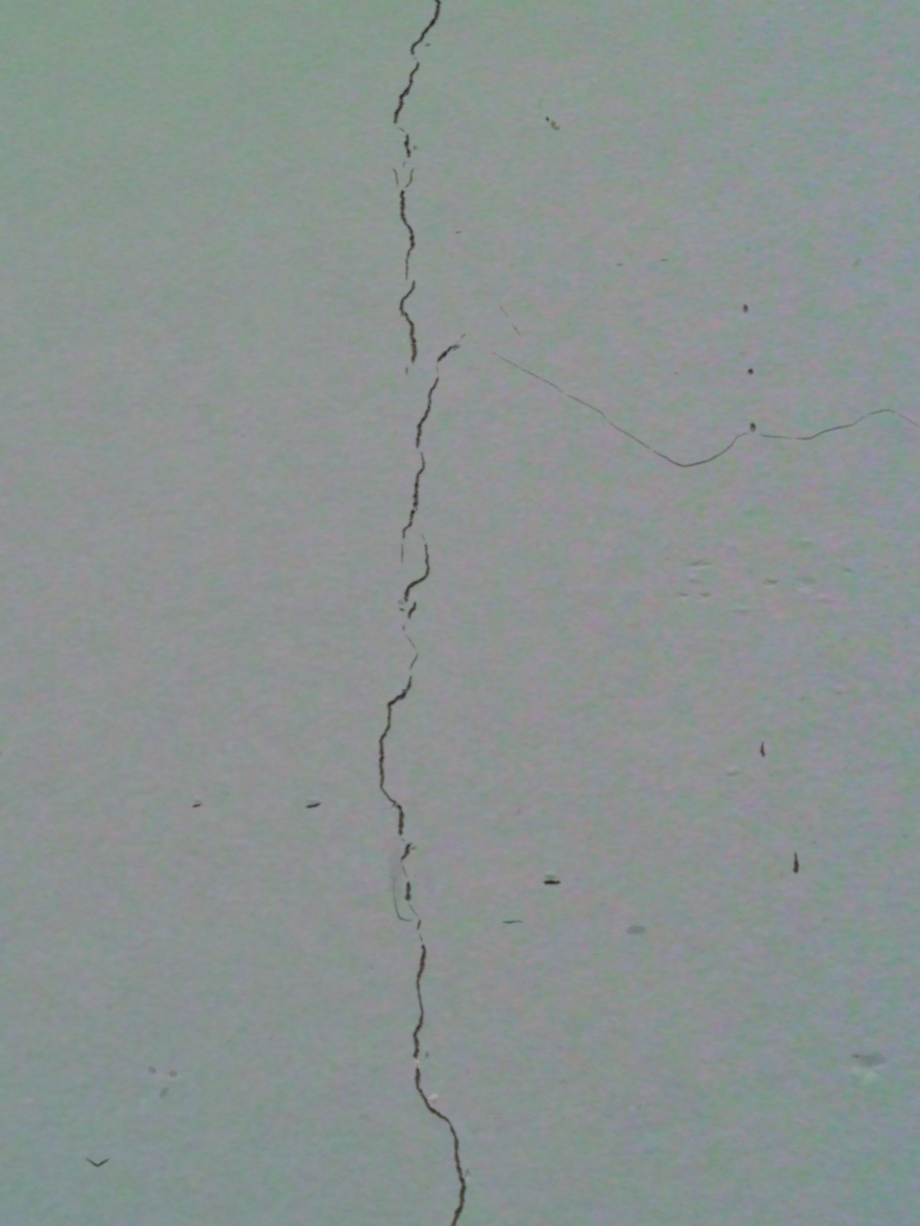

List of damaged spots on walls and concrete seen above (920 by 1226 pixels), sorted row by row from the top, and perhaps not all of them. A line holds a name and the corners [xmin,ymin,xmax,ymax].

crack [379,0,471,1226]
crack [494,353,920,467]